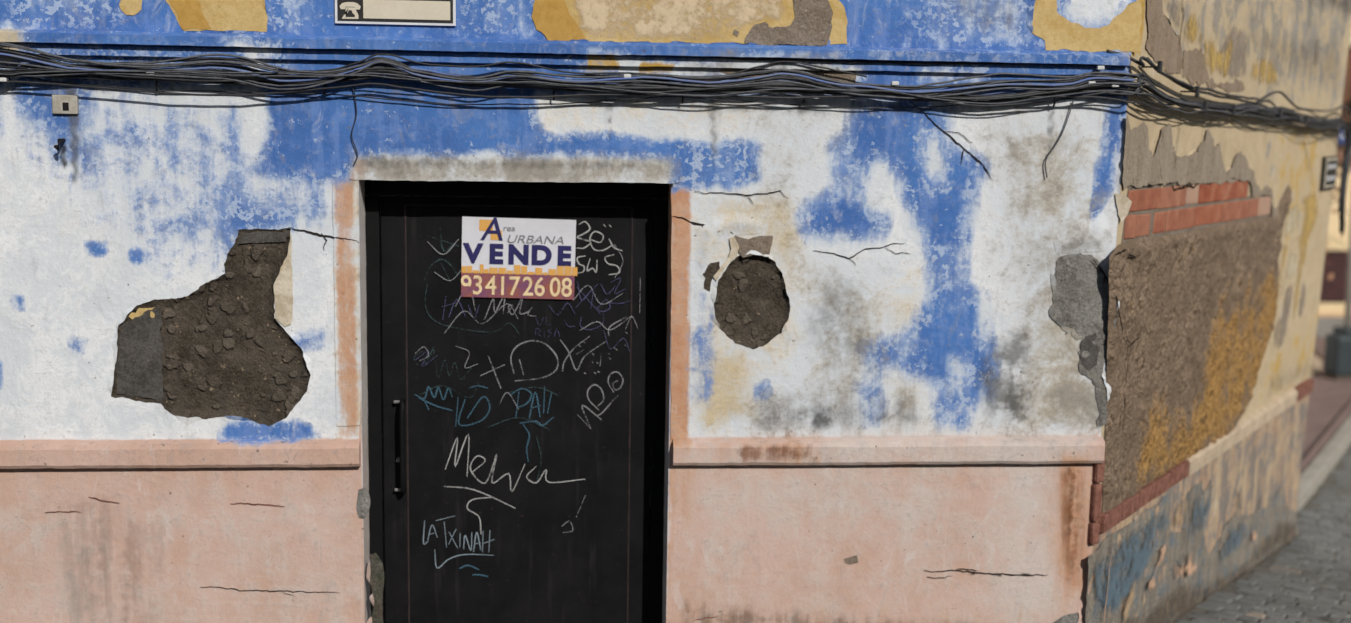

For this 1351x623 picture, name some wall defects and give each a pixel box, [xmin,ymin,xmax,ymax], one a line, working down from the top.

peeling [119,0,142,15]
peeling [166,0,271,34]
peeling [532,0,848,46]
peeling [720,68,857,85]
peeling [1027,0,1247,94]
flaking render [1122,115,1278,243]
spalling [107,226,312,426]
spalling [703,235,790,349]
peeling [1049,253,1120,427]
peeling [1053,460,1298,623]